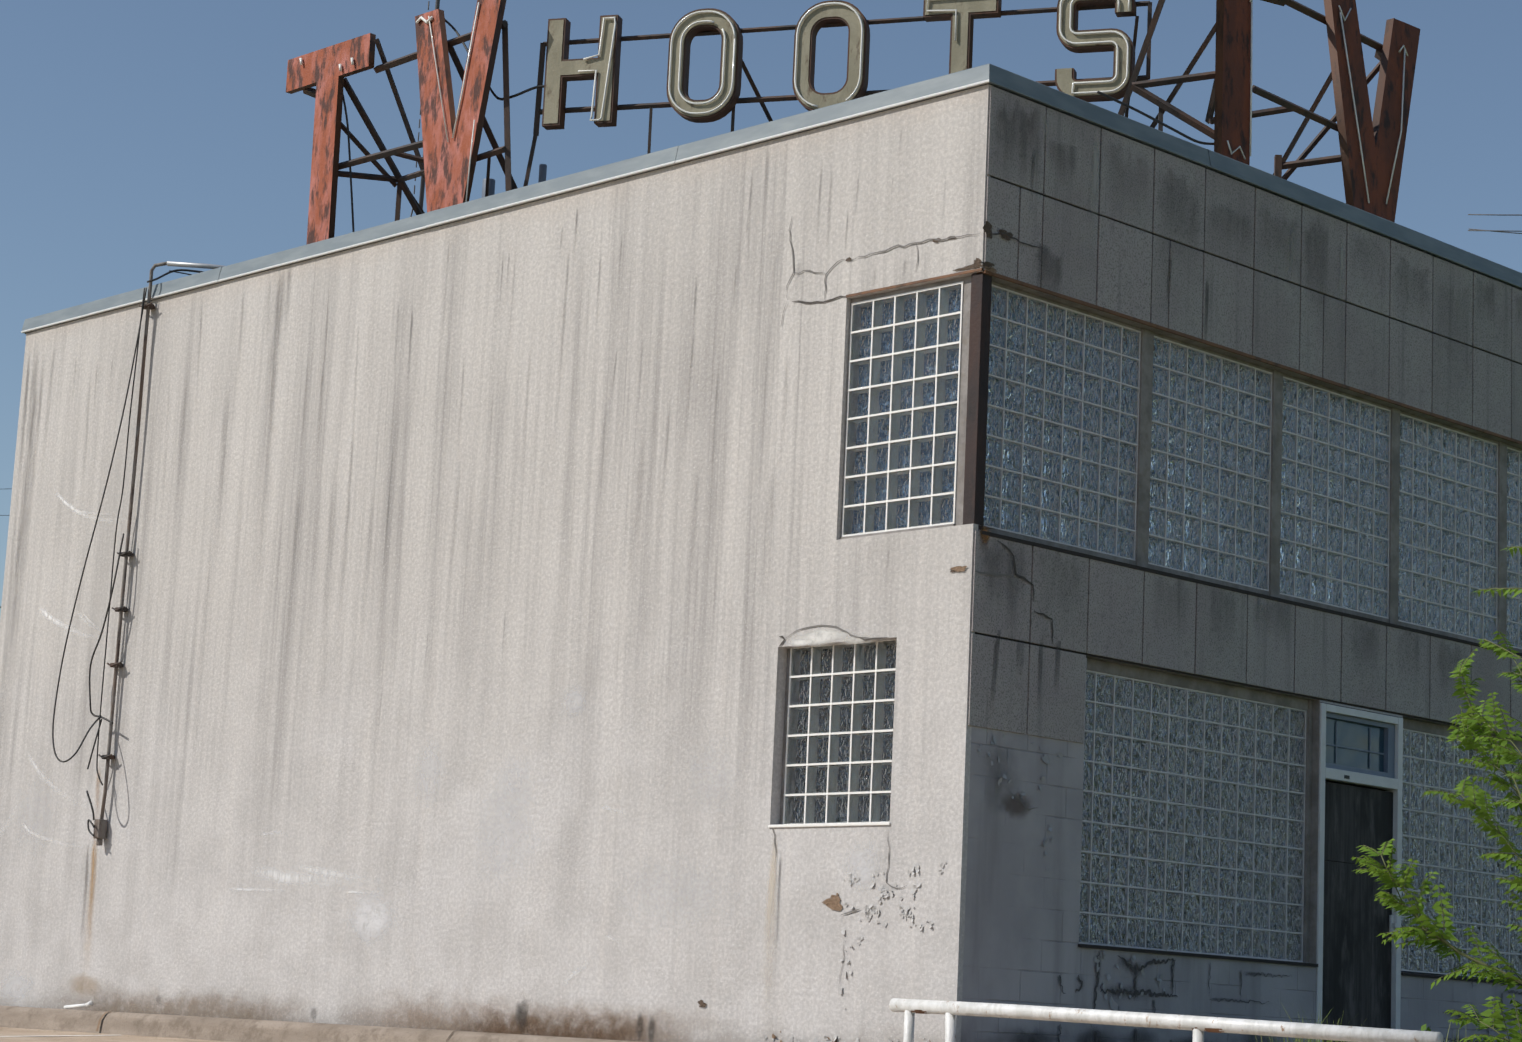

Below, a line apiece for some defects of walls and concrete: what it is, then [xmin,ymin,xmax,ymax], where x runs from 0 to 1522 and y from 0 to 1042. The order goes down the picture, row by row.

crack [781,218,979,324]
crack [975,541,1054,643]
peeling [822,864,933,1010]